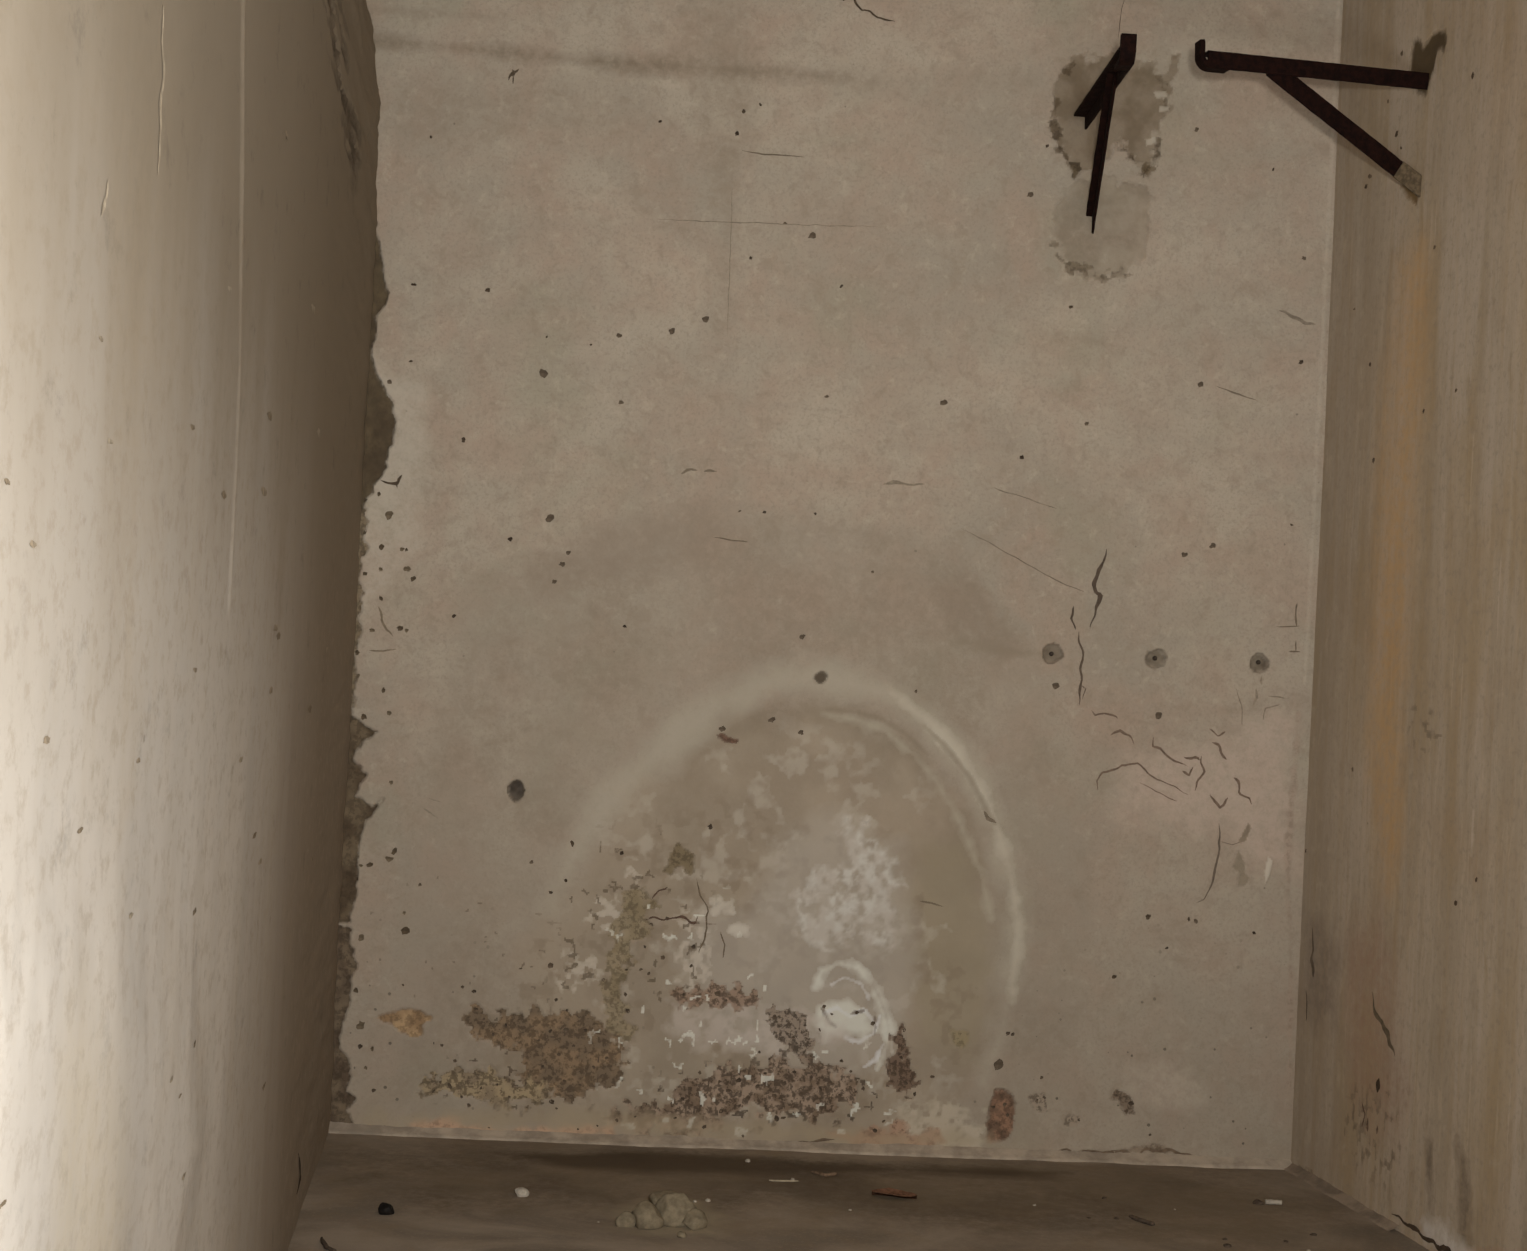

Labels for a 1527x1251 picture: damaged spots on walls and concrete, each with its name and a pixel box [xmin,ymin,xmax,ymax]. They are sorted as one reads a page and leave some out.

spalling [321,0,362,215]
spalling [330,221,865,1129]
crack [1070,549,1284,903]
crack [1279,604,1300,652]
damp [306,489,1477,1251]
spalling [855,1011,935,1099]
spalling [985,1076,1081,1141]
corrosion [1340,890,1425,1176]
crack [1392,1214,1451,1251]